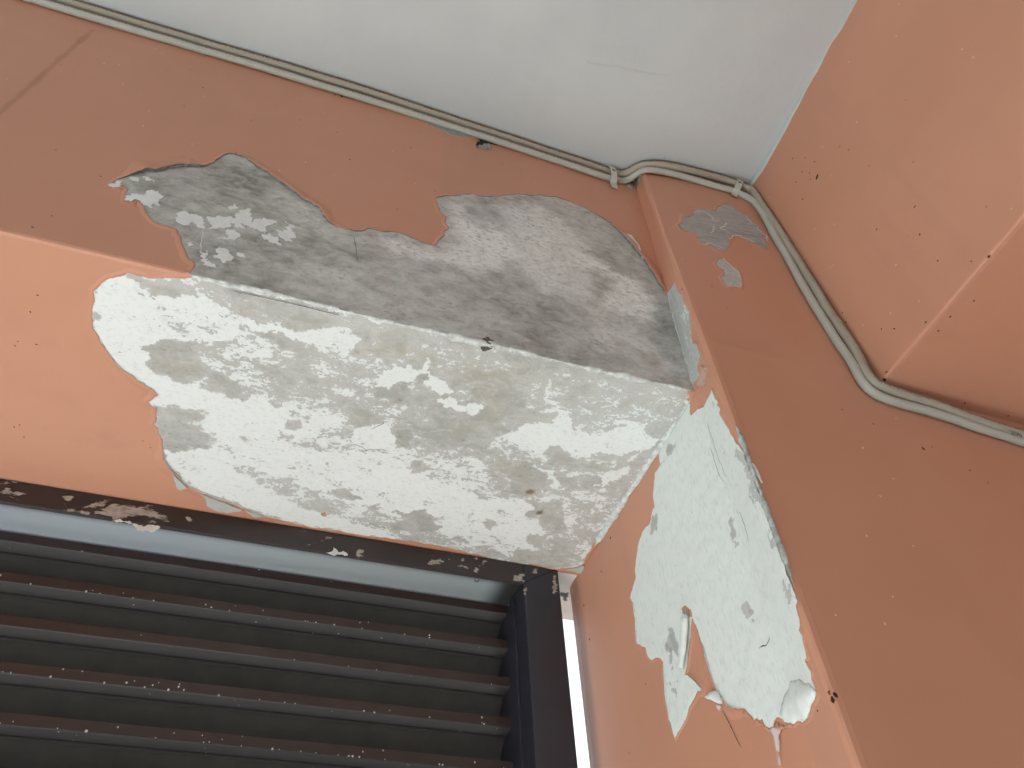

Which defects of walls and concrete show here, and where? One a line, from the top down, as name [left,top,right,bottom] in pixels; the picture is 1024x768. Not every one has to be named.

peeling [86,152,820,741]